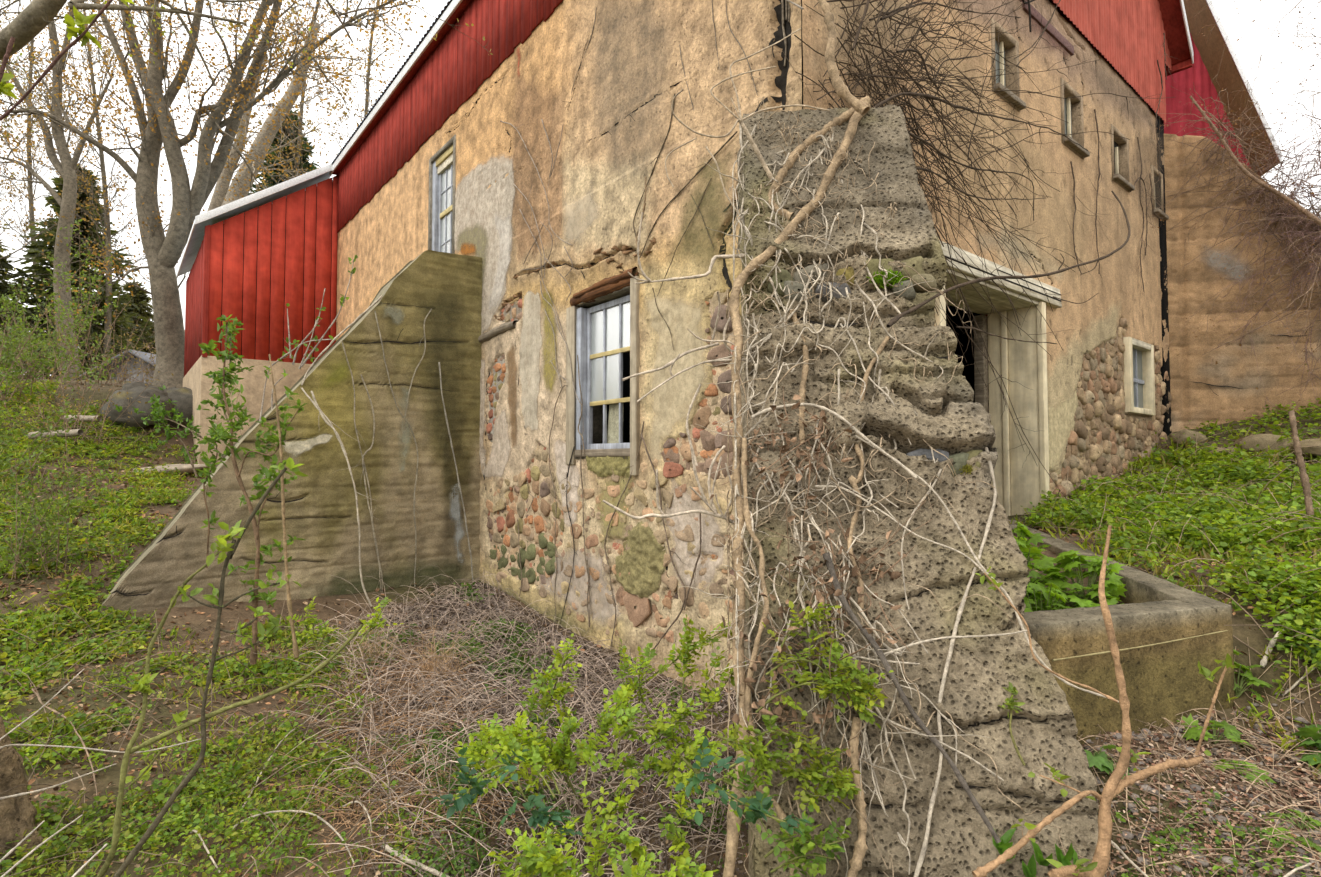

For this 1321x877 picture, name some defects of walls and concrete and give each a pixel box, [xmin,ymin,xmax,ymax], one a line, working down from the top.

crack [755,0,792,112]
crack [344,303,459,344]
crack [357,383,449,391]
crack [479,238,656,490]
flaking render [486,289,741,643]
flaking render [1049,318,1172,500]